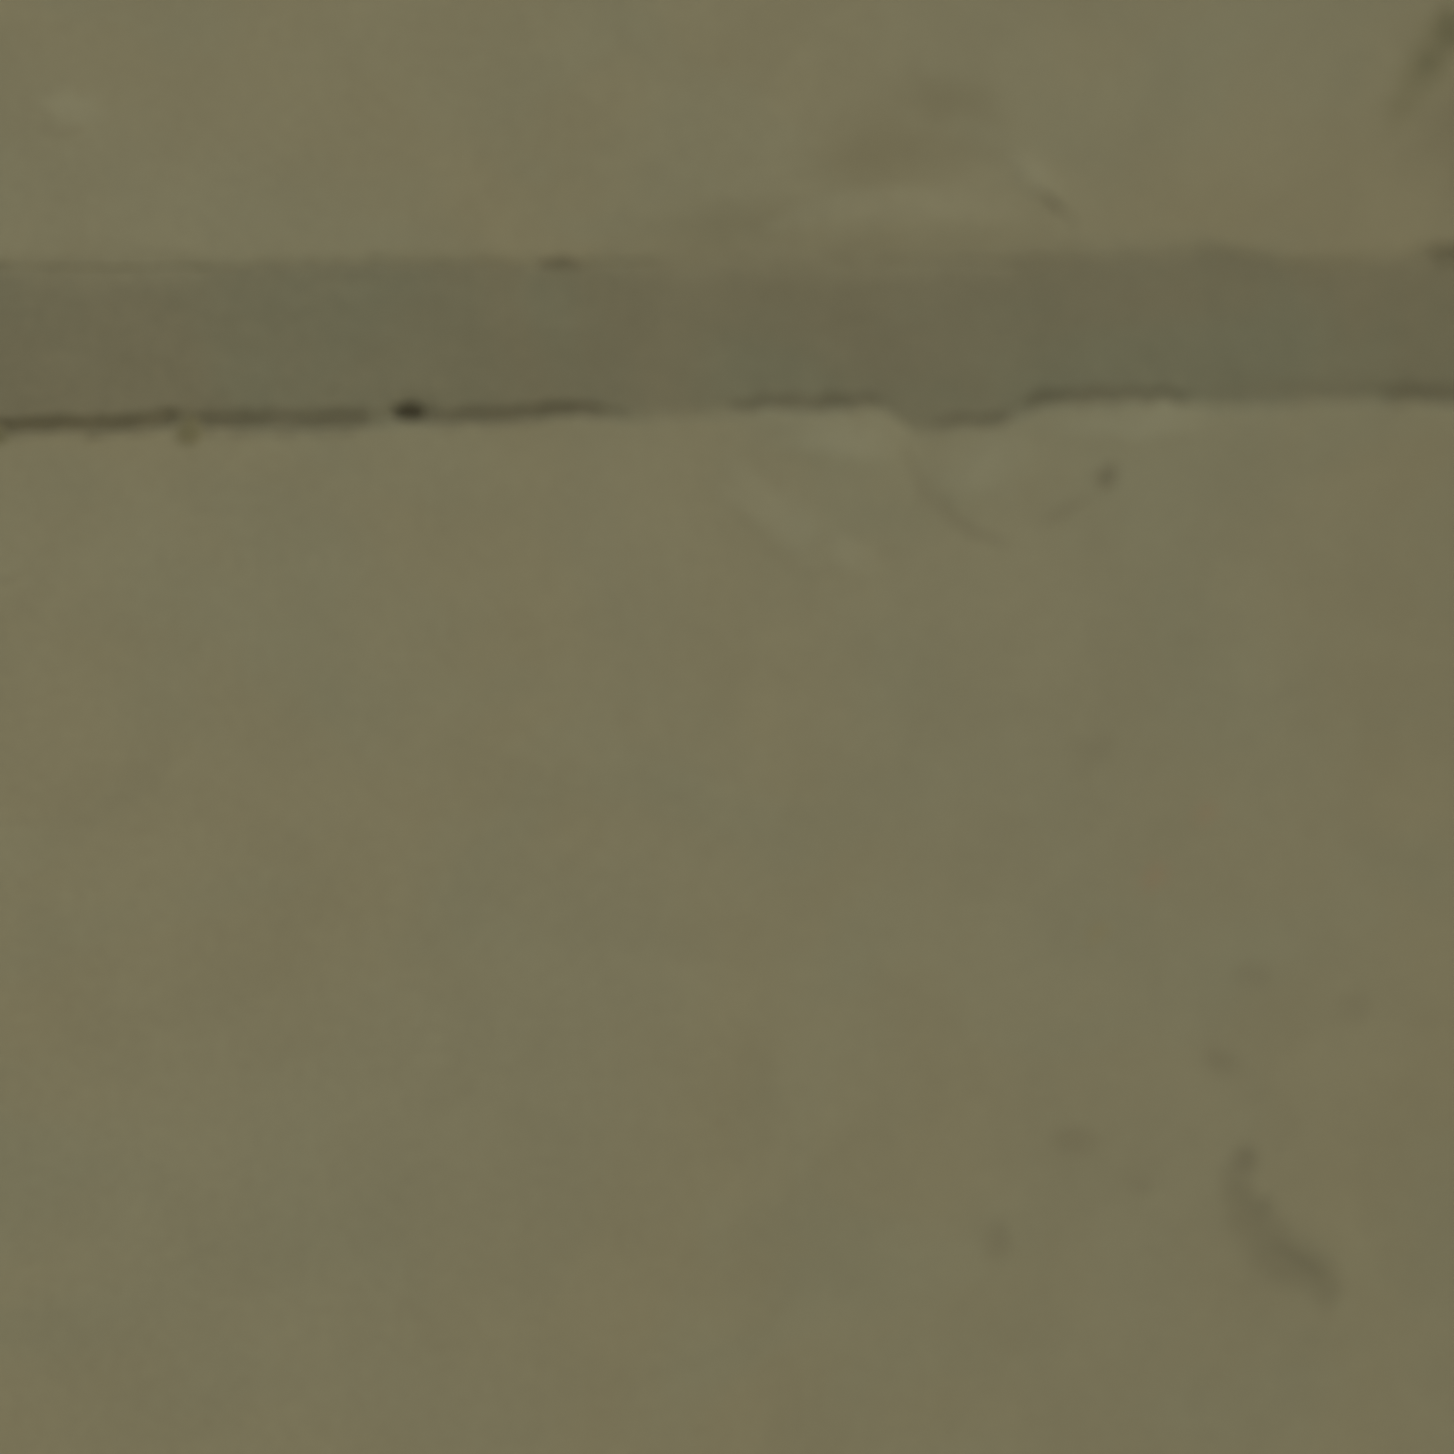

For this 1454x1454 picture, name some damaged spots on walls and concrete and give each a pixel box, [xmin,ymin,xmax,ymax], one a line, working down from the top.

crack [0,396,621,450]
crack [722,385,887,417]
crack [926,379,1200,431]